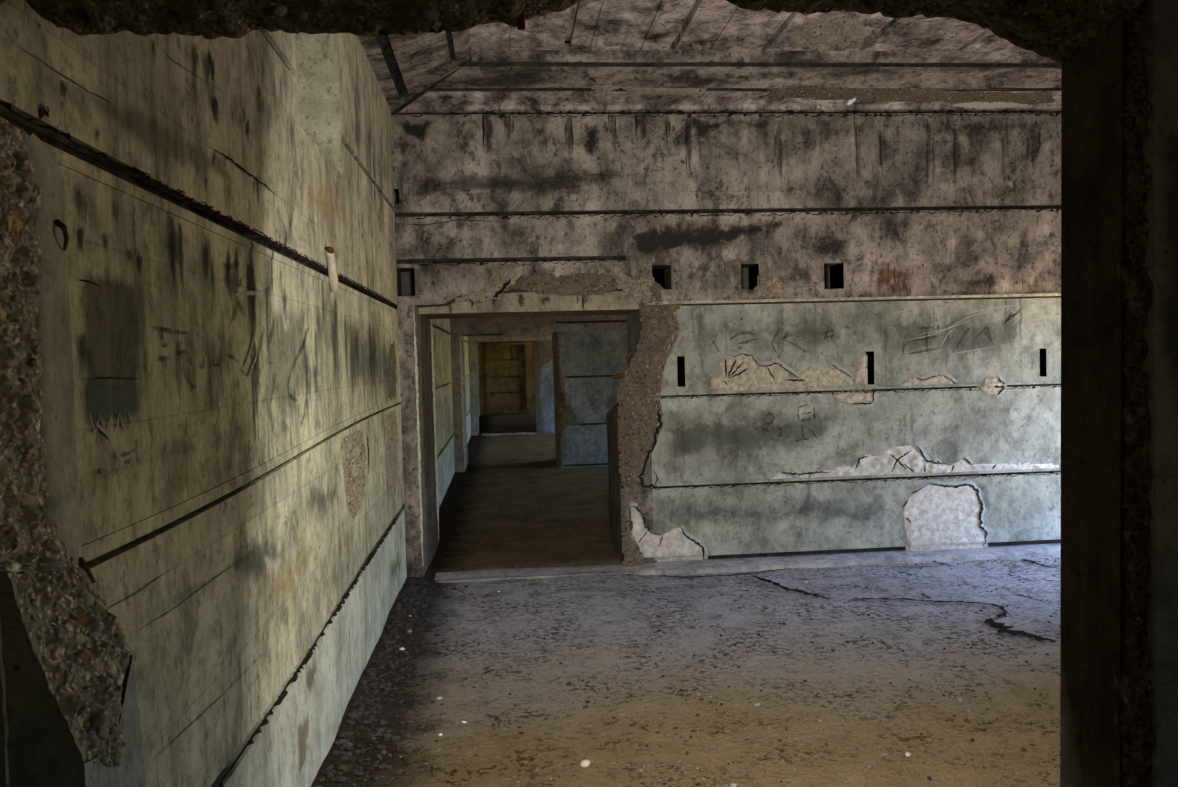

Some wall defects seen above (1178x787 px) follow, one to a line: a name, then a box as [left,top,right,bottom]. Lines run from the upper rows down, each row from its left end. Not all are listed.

spalling [741,264,783,300]
spalling [0,108,132,767]
spalling [455,264,708,567]
peeling [710,350,877,408]
peeling [771,444,1059,551]
crack [648,567,1056,642]